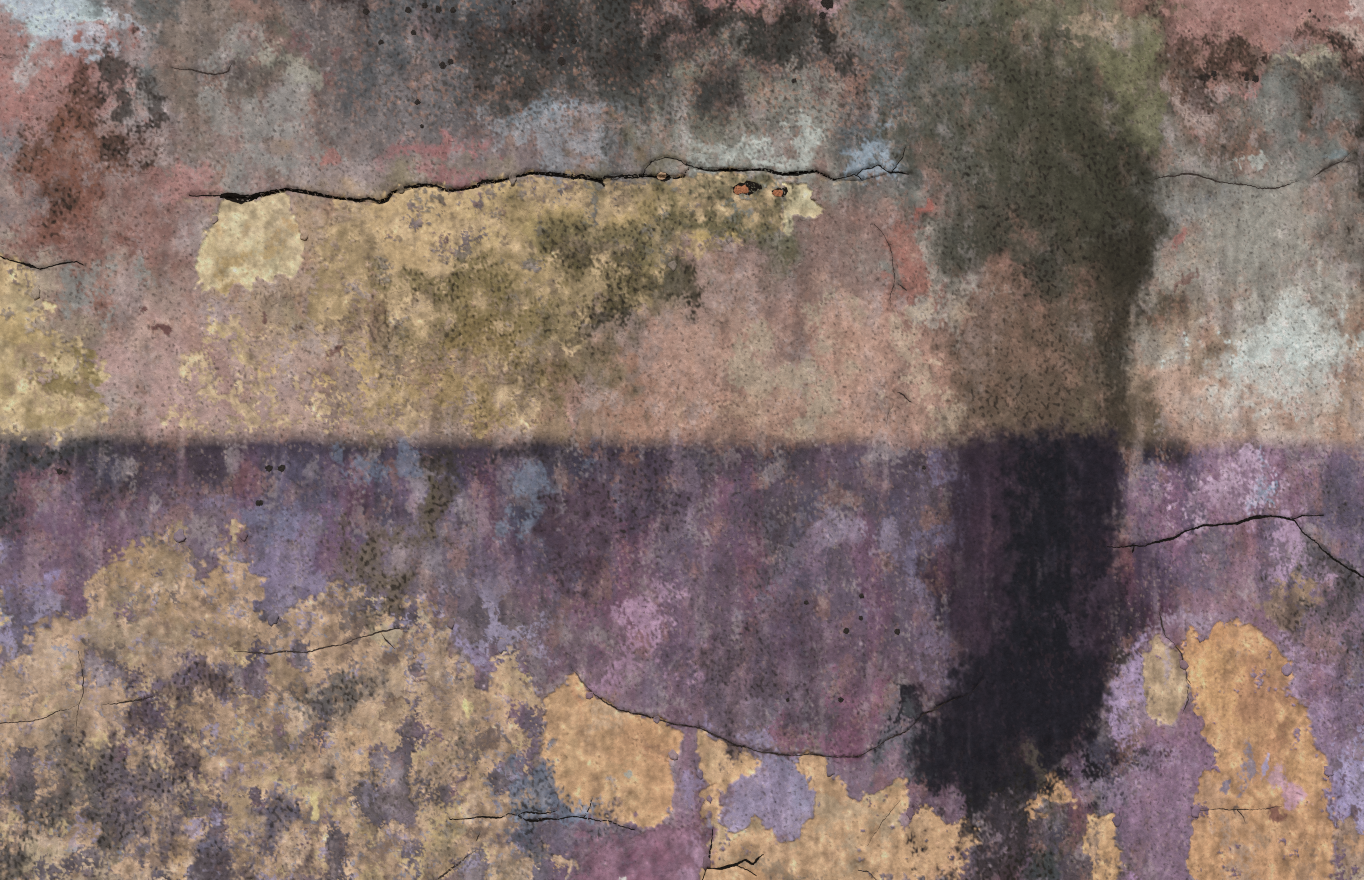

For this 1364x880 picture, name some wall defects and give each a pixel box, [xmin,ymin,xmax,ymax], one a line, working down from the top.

crack [189,147,909,204]
flaking render [655,164,825,221]
peeling [667,232,741,272]
peeling [0,249,113,446]
peeling [154,167,588,441]
damp [291,0,1364,880]
crack [1107,514,1364,578]
peeling [0,516,971,880]
crack [571,667,985,758]
peeling [1140,559,1364,880]
crack [702,829,764,880]
peeling [1063,788,1125,880]